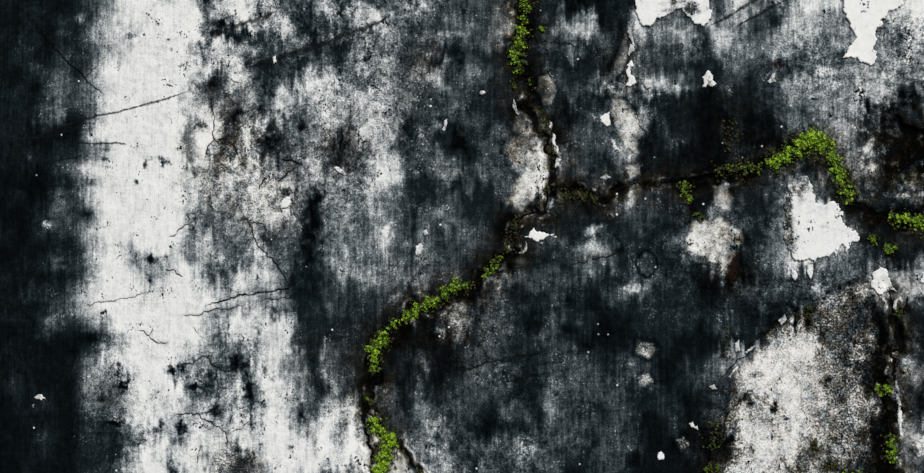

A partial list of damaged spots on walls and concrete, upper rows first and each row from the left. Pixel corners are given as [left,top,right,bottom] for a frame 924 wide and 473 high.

spalling [609,28,651,89]
peeling [635,0,712,26]
peeling [843,0,904,66]
spalling [600,97,643,179]
leakage [0,0,131,473]
crack [183,219,305,316]
crack [361,0,773,473]
peeling [784,175,860,280]
crack [174,355,248,444]
crack [717,302,795,387]
spalling [709,267,924,473]
crack [876,287,908,473]